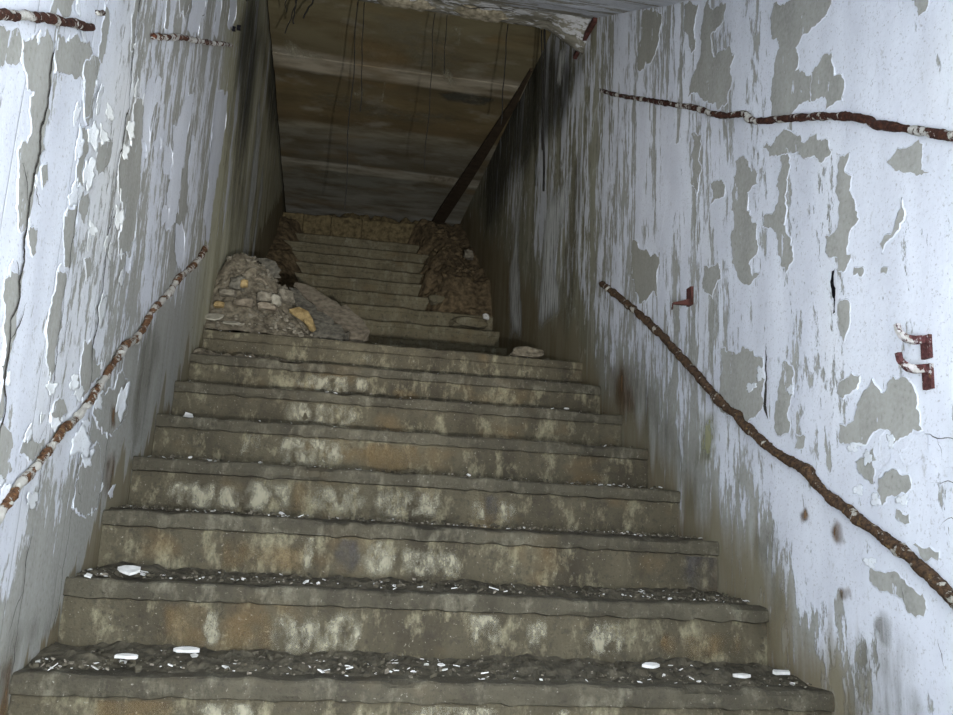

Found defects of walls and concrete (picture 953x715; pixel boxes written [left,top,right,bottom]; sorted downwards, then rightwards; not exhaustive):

peeling [683,0,735,111]
peeling [770,0,846,116]
crack [0,42,56,431]
peeling [0,0,145,519]
leakage [233,3,275,257]
peeling [630,239,660,305]
peeling [690,128,865,286]
peeling [837,298,851,343]
peeling [886,139,930,177]
peeling [719,346,807,450]
peeling [837,371,923,526]
peeling [862,557,928,619]